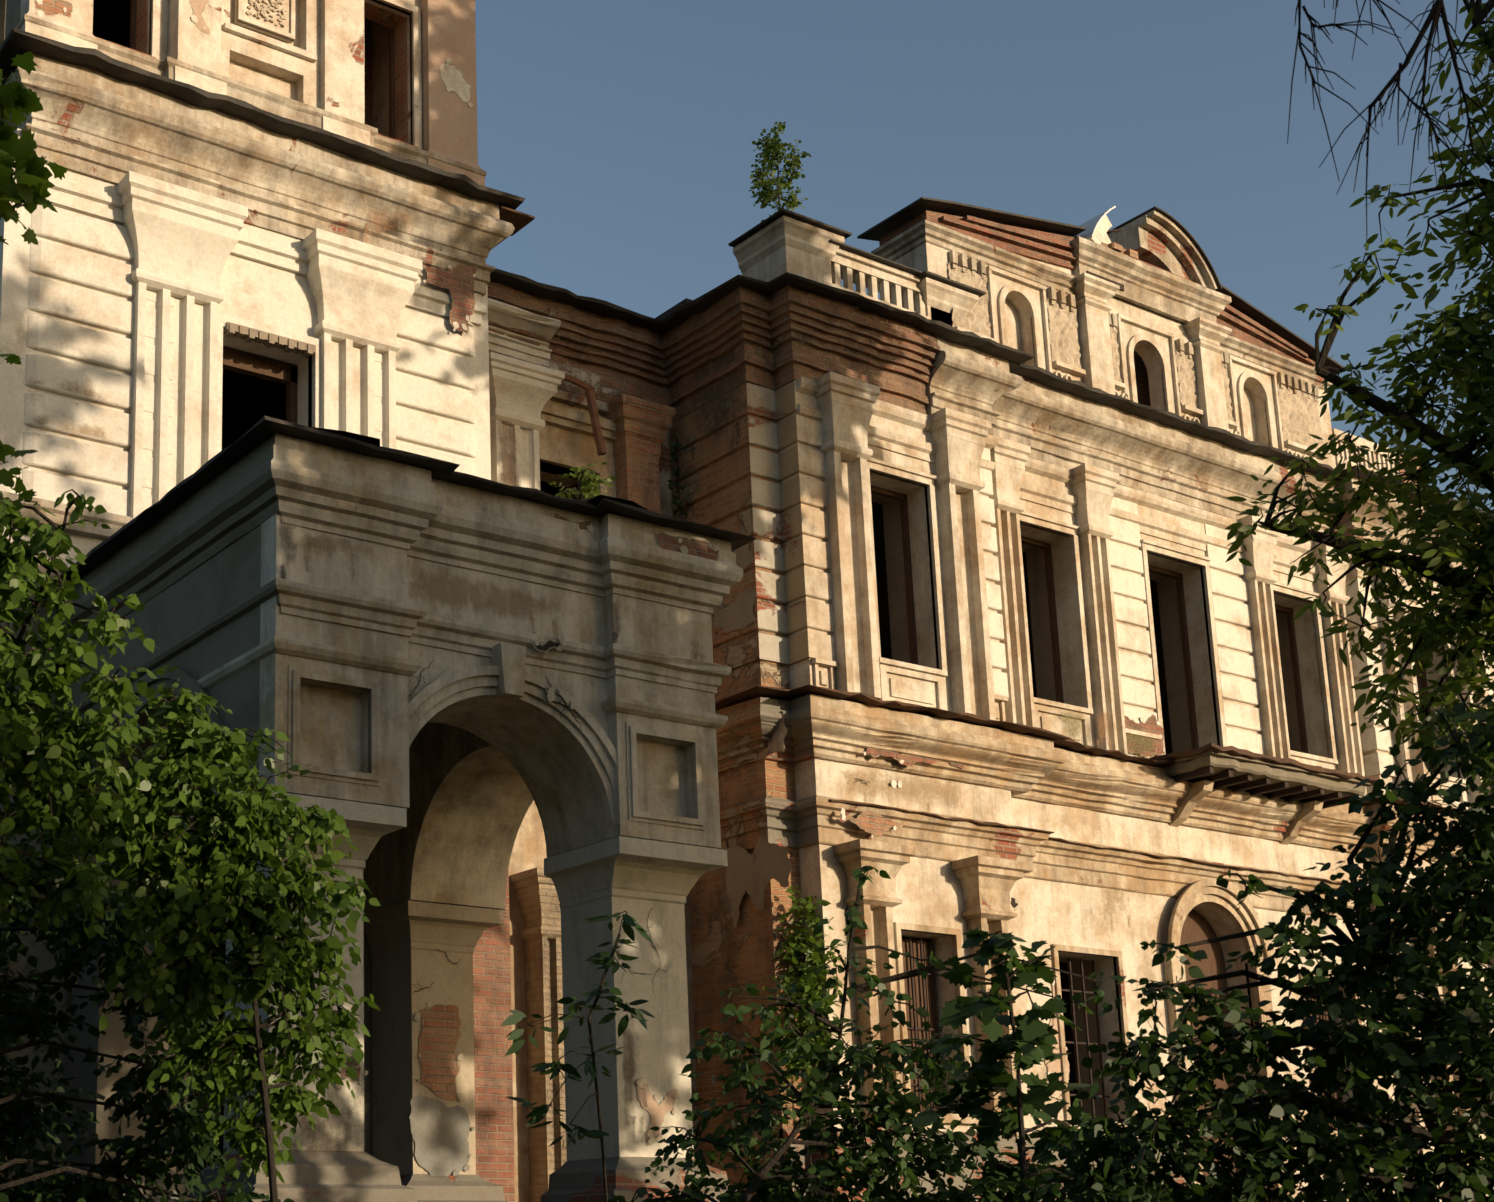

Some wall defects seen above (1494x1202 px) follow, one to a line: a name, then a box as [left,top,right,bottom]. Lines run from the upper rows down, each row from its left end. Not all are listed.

flaking render [34,0,73,19]
peeling [188,0,211,35]
flaking render [423,263,478,333]
flaking render [838,808,906,838]
flaking render [414,1001,464,1103]